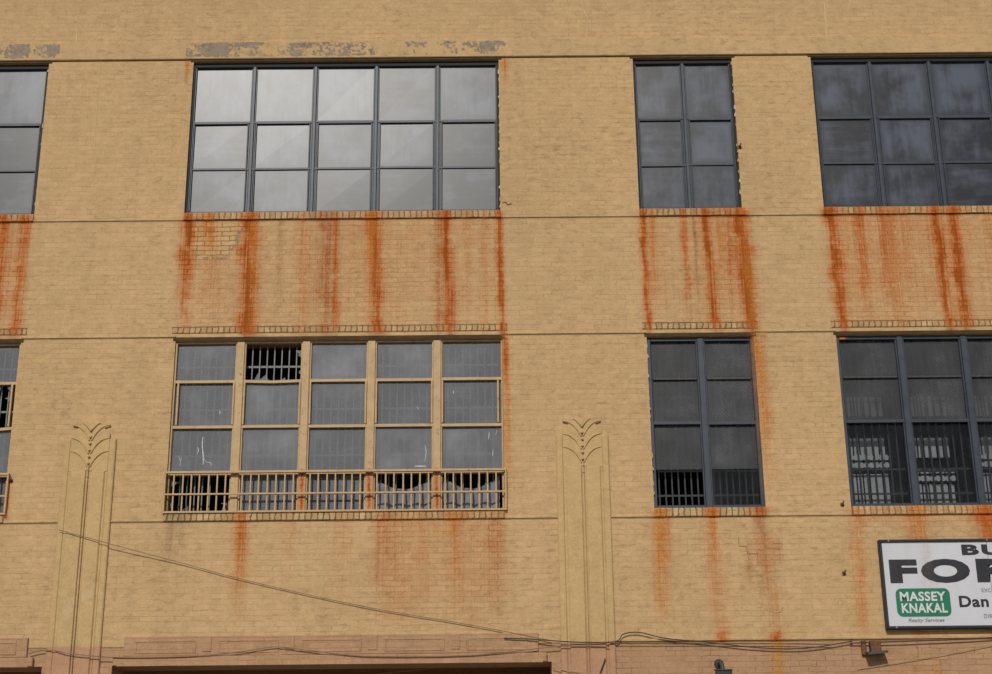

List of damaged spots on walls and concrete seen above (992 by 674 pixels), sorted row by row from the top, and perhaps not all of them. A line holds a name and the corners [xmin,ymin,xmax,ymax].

peeling [0,44,60,80]
peeling [186,42,390,57]
peeling [400,40,506,55]
rust [178,212,213,304]
rust [237,212,258,334]
rust [367,211,382,331]
rust [436,210,455,330]
rust [496,210,510,405]
rust [639,208,654,328]
rust [701,207,767,413]
rust [822,207,867,339]
rust [919,206,970,328]